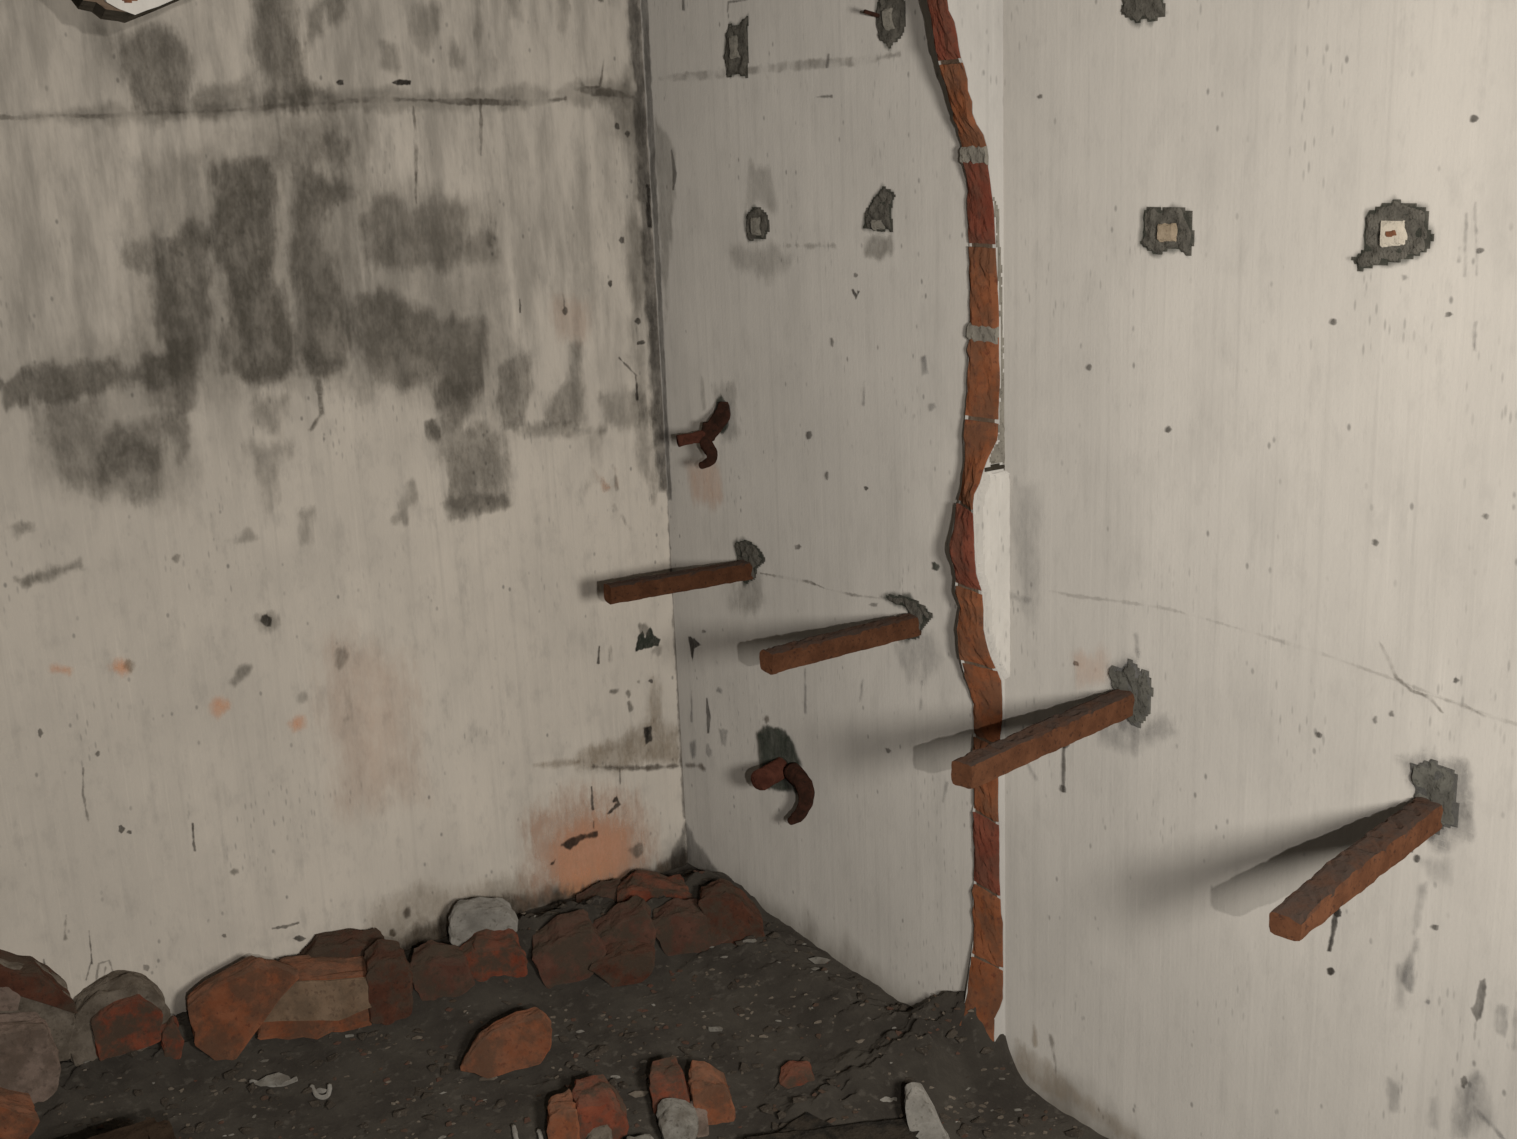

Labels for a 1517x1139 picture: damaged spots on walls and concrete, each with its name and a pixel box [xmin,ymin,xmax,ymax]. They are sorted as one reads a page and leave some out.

leakage [216,161,341,382]
flaking render [927,0,1005,750]
corrosion [604,560,753,605]
corrosion [759,613,922,675]
corrosion [951,689,1135,789]
flaking render [960,778,1003,1041]
corrosion [1269,797,1443,941]